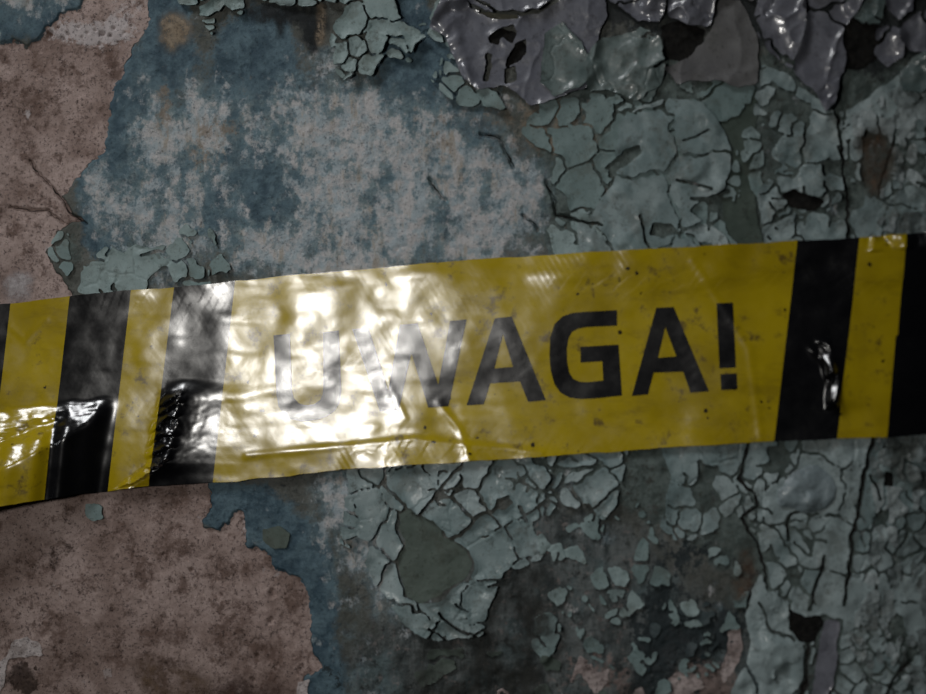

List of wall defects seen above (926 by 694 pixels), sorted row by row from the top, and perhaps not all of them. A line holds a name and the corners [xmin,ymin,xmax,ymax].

crack [18,163,84,221]
spalling [0,0,231,304]
peeling [177,0,245,35]
peeling [263,0,926,255]
spalling [0,482,323,694]
peeling [339,451,628,694]
peeling [582,434,926,694]